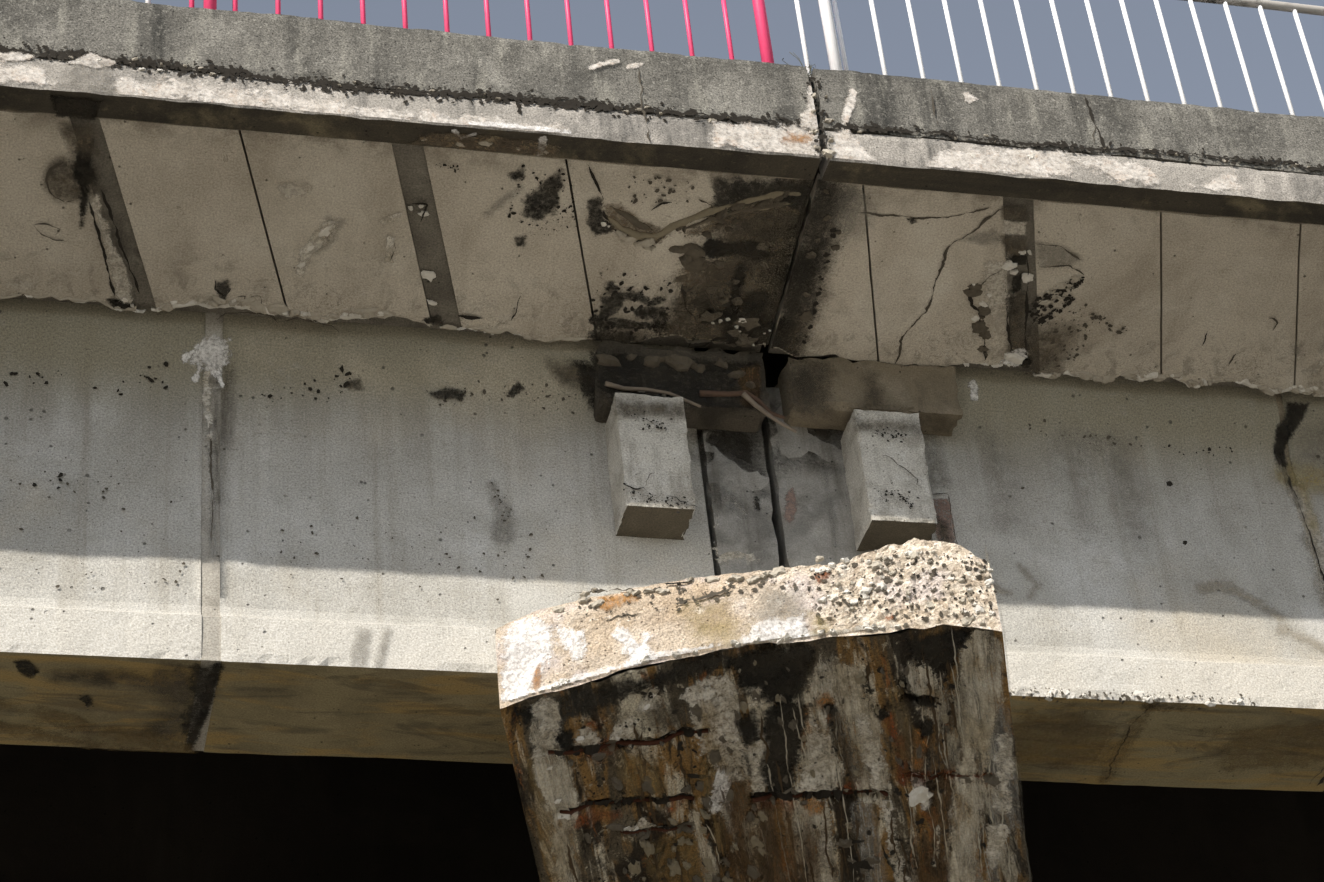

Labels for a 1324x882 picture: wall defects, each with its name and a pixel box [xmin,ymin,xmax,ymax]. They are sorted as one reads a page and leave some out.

damp [45,95,101,227]
damp [452,121,614,246]
damp [552,177,844,412]
spalling [10,457,127,499]
spalling [424,529,547,580]
spalling [552,549,998,626]
damp [805,428,843,483]
crack [1281,454,1324,595]
spalling [553,641,986,882]